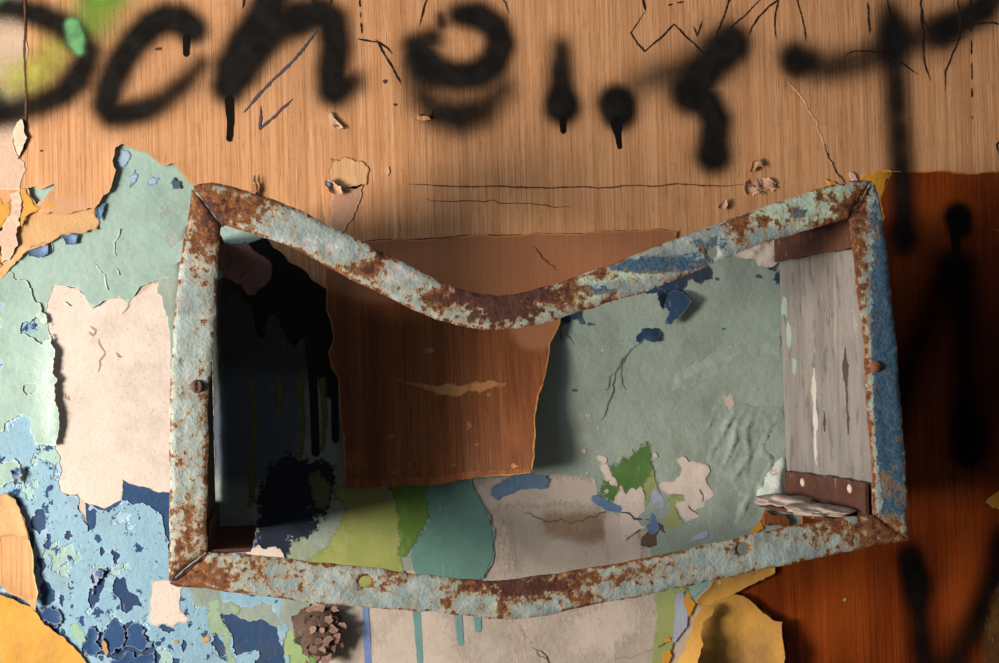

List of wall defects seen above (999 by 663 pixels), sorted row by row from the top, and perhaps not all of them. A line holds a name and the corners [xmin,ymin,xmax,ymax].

crack [787,79,845,183]
peeling [328,157,369,232]
crack [413,183,741,208]
peeling [561,311,595,332]
peeling [636,266,719,344]
flaking render [0,271,171,524]
crack [603,340,644,418]
flaking render [582,449,666,548]
flaking render [658,456,714,523]
peeling [0,459,62,628]
flaking render [82,580,189,663]
crack [512,620,551,663]